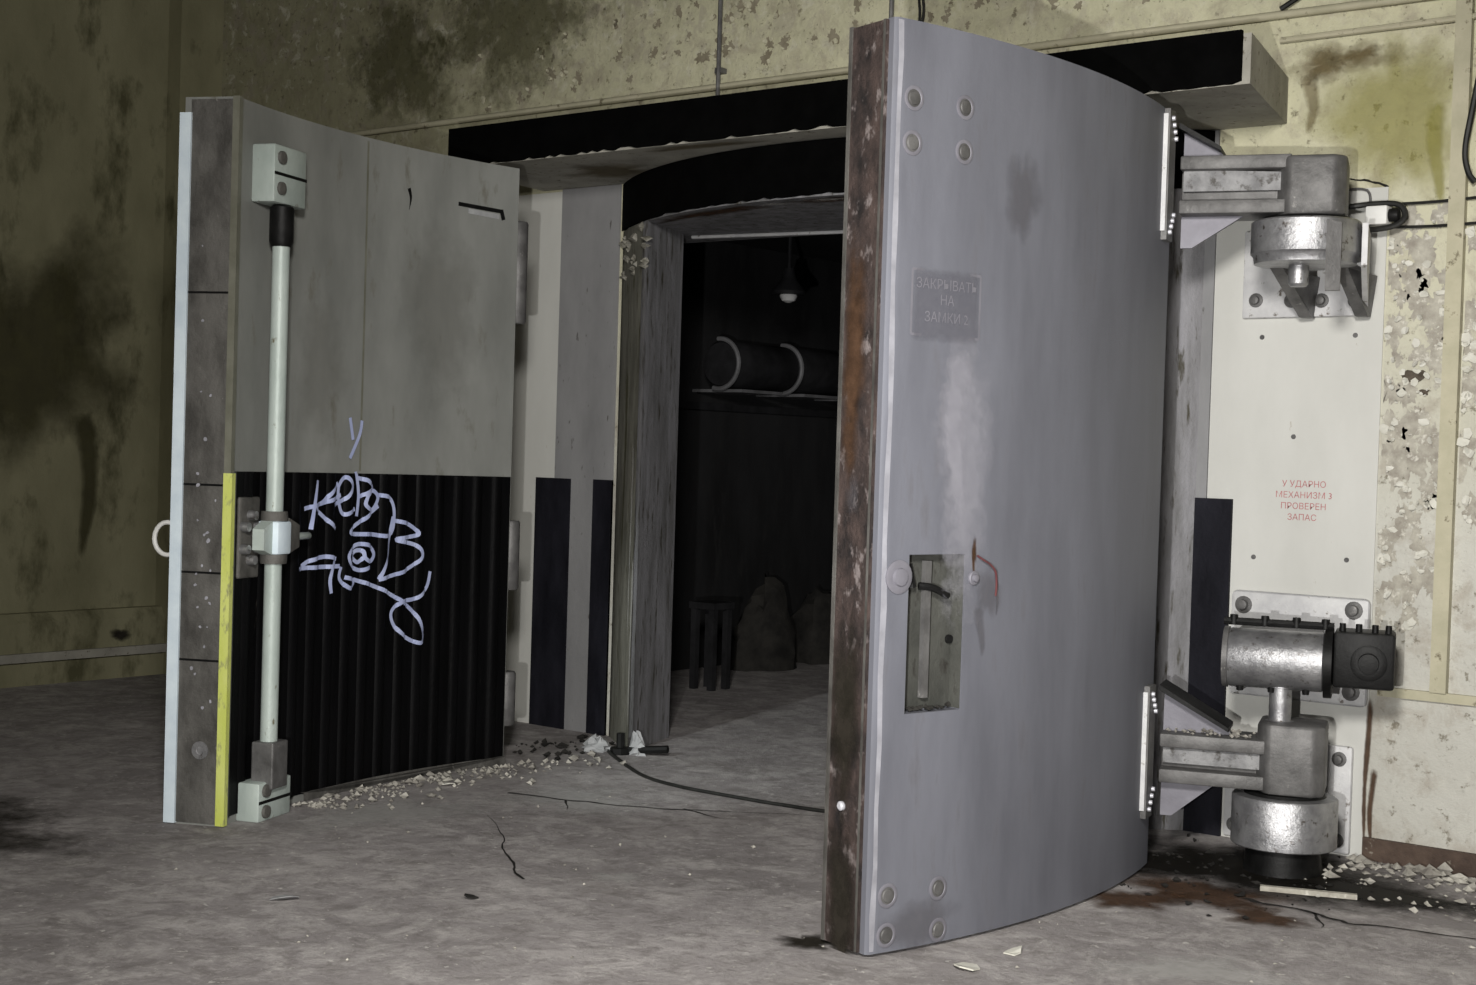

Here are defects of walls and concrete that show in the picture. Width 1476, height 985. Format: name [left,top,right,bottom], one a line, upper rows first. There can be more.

damp [369,0,577,109]
damp [1352,68,1442,196]
rust [844,264,863,469]
rust [831,640,856,802]
crack [487,792,815,879]
rust [1096,875,1298,926]